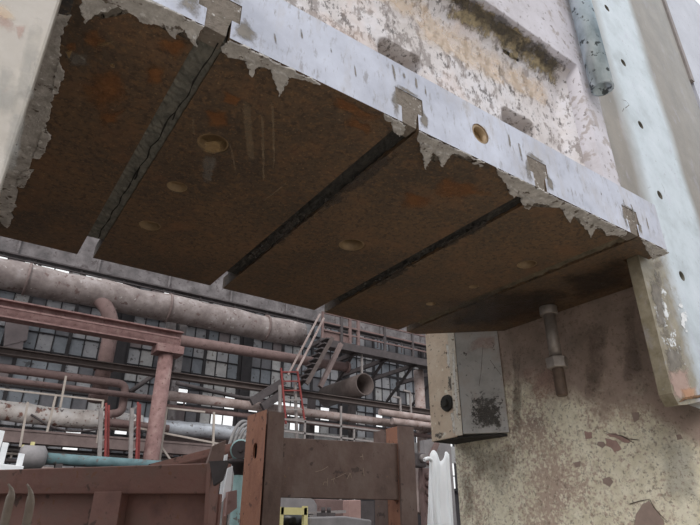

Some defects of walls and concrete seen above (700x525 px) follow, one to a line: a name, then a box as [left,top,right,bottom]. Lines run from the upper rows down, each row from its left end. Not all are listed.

peeling [79,0,204,47]
peeling [0,14,71,228]
crack [98,43,219,238]
peeling [417,131,485,169]
peeling [496,167,627,238]
peeling [641,238,669,260]
peeling [584,431,630,452]
peeling [634,500,664,525]